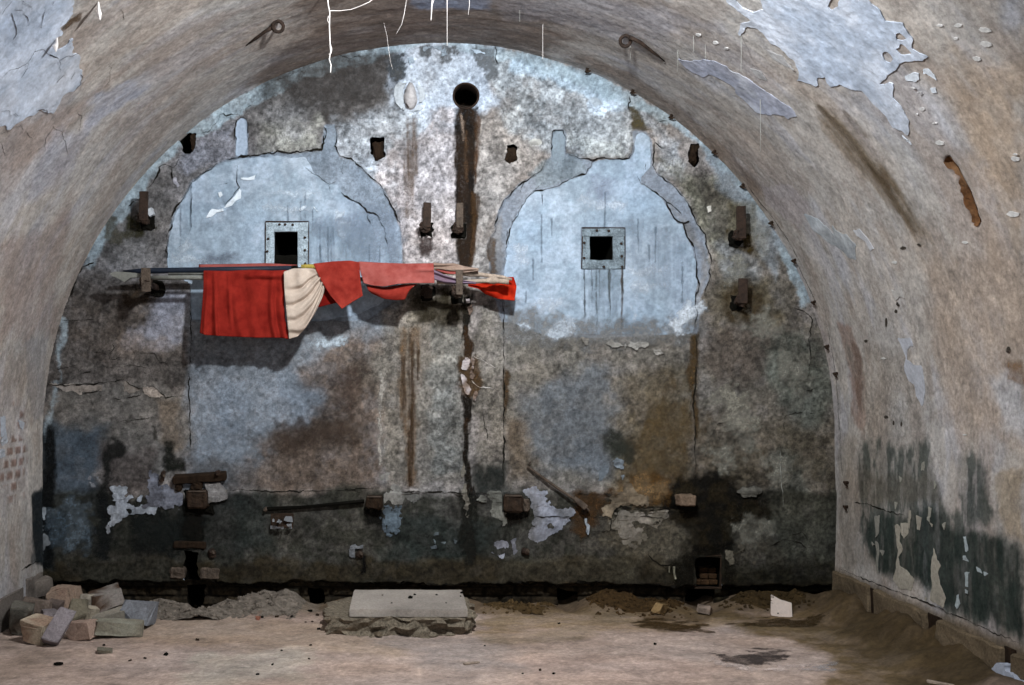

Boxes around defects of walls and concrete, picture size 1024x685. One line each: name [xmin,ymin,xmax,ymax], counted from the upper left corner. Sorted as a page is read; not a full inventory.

peeling [0,0,83,130]
peeling [678,59,797,119]
peeling [726,0,937,145]
crack [129,105,401,263]
corrosion [454,105,497,274]
crack [494,120,730,469]
corrosion [400,286,482,492]
crack [407,299,506,495]
leakage [712,387,759,451]
peeling [106,485,158,534]
peeling [491,486,576,559]
leakage [661,447,771,591]